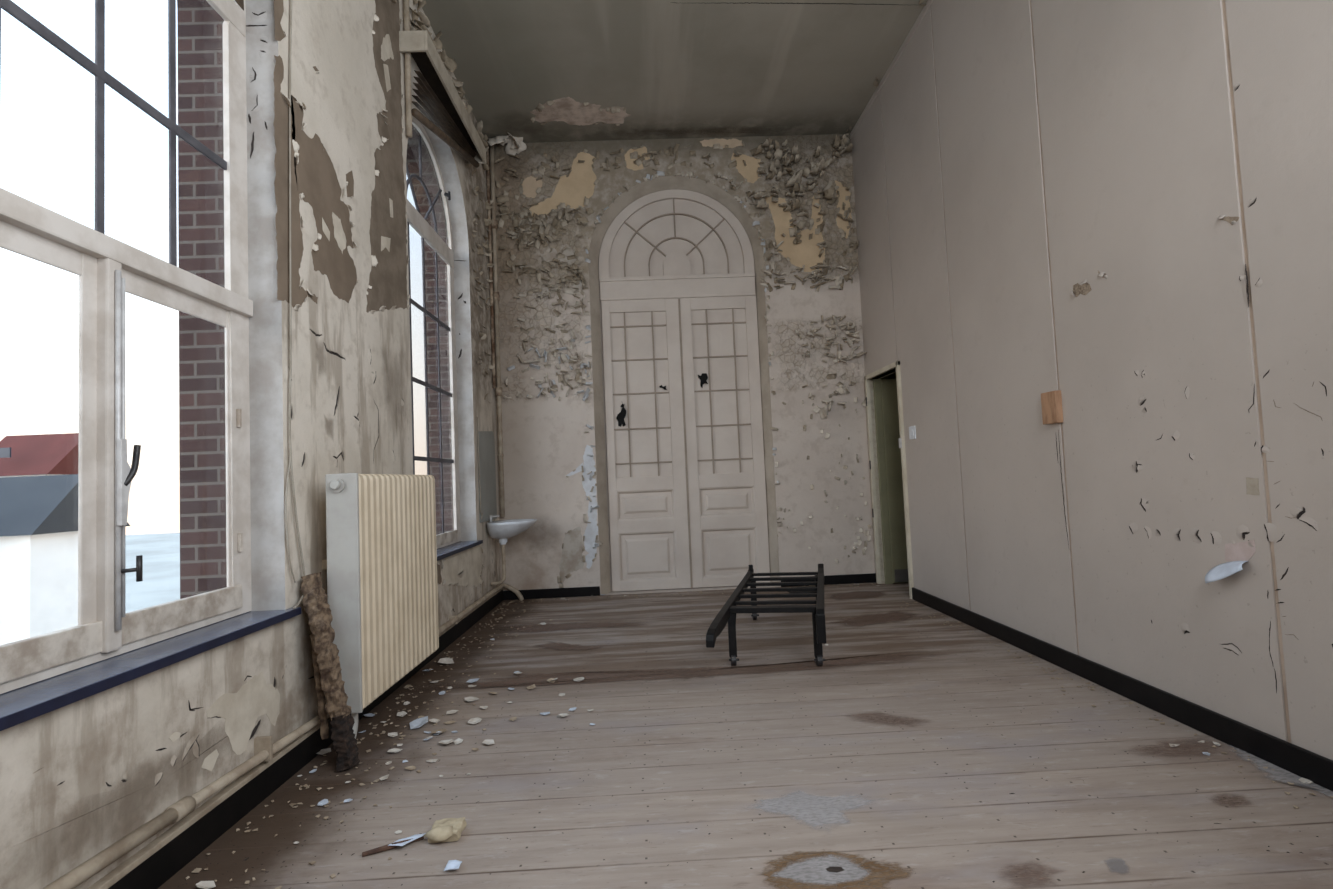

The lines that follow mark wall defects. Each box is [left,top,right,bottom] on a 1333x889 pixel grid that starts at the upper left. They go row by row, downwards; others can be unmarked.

peeling [273,0,859,405]
flaking render [1071,271,1108,297]
peeling [795,315,869,440]
peeling [557,424,603,588]
peeling [1205,540,1256,583]
peeling [201,671,280,771]